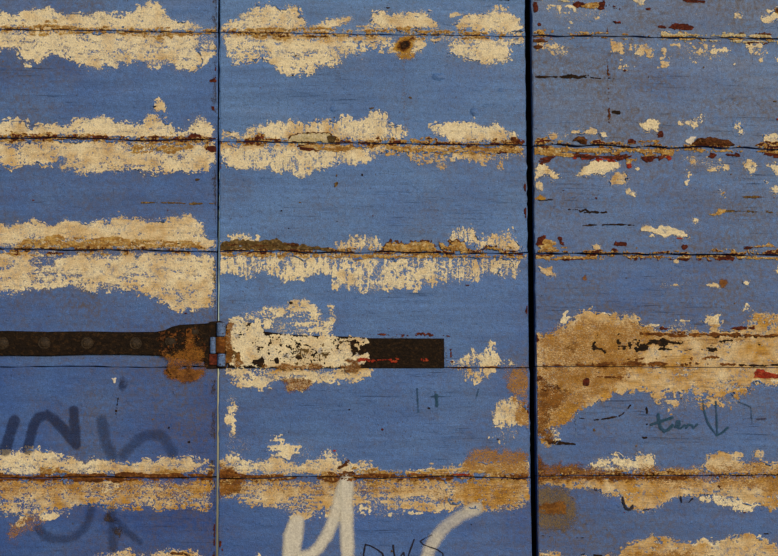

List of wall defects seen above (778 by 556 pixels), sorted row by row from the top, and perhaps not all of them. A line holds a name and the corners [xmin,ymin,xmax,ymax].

peeling [0,0,778,78]
corrosion [393,36,416,59]
peeling [0,97,778,197]
peeling [0,210,778,314]
corrosion [156,327,210,384]
peeling [0,298,778,528]
peeling [101,547,202,556]
peeling [581,532,778,556]